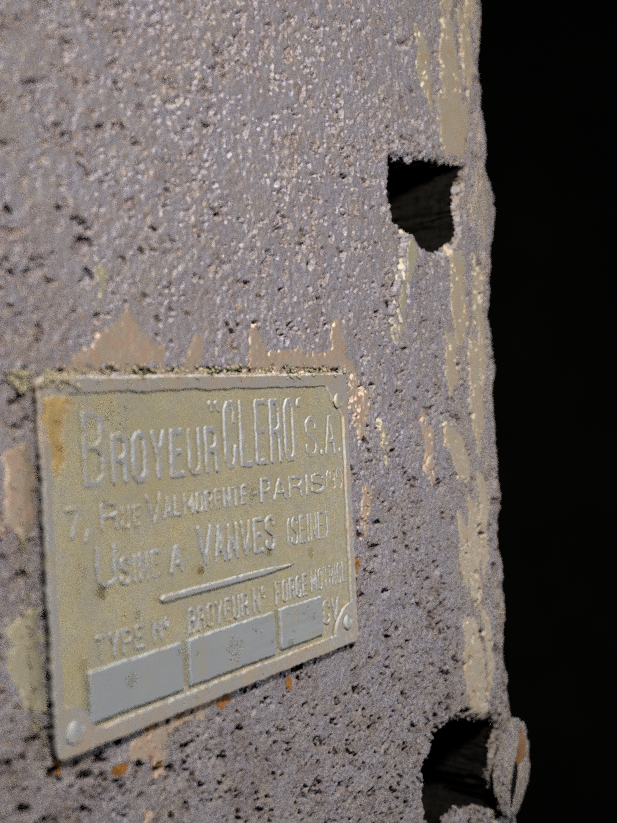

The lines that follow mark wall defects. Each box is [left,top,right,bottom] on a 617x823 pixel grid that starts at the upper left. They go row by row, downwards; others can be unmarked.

peeling [411,0,476,165]
peeling [58,305,168,376]
peeling [419,244,495,721]
peeling [117,698,217,781]
peeling [141,808,154,823]